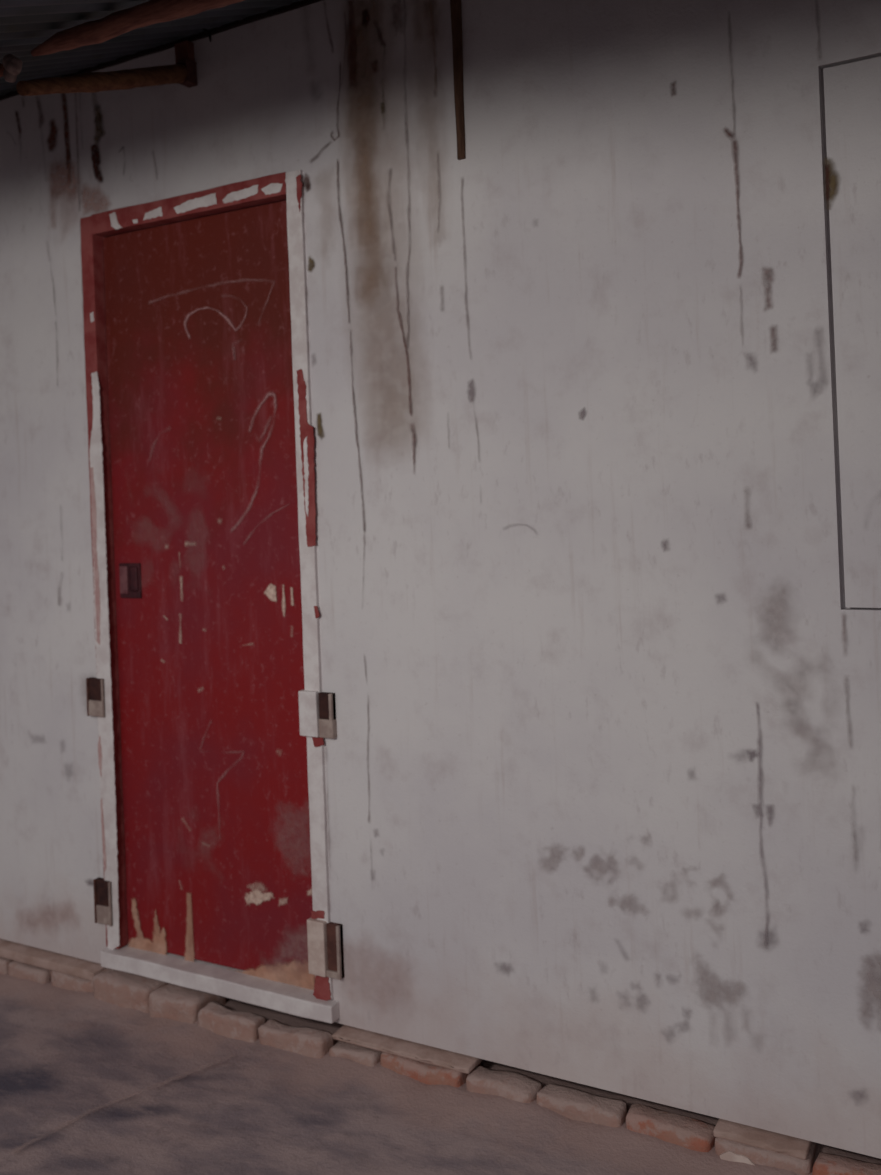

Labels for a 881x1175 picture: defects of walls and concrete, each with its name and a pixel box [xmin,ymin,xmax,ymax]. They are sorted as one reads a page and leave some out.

crack [750,738,772,815]